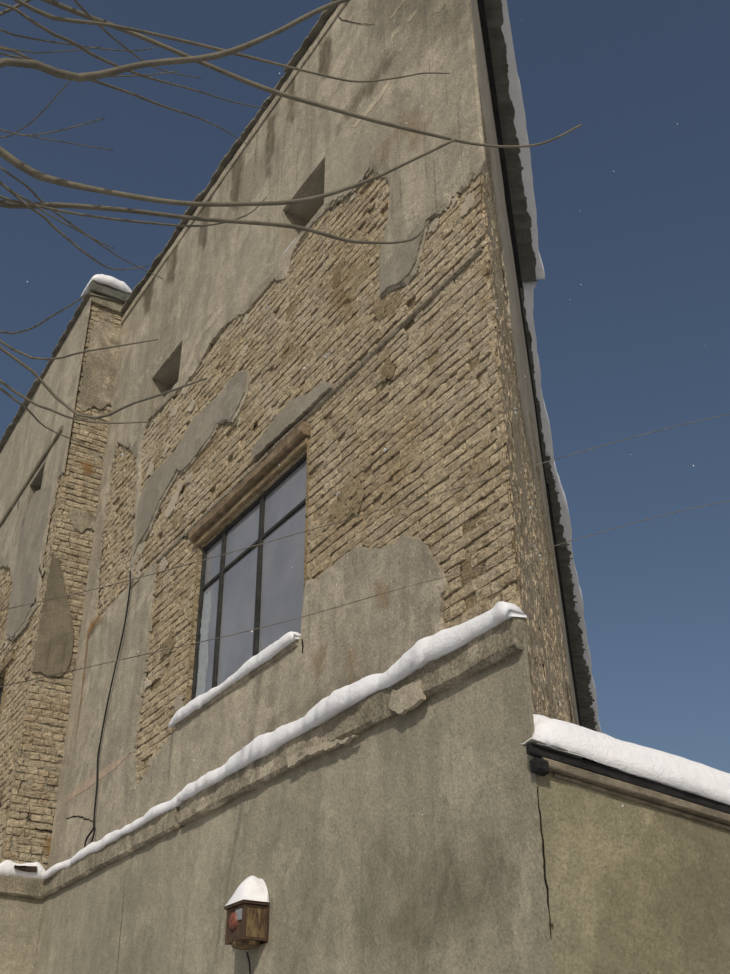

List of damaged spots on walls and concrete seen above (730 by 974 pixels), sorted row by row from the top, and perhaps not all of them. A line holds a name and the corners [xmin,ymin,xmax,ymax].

flaking render [0,80,577,870]